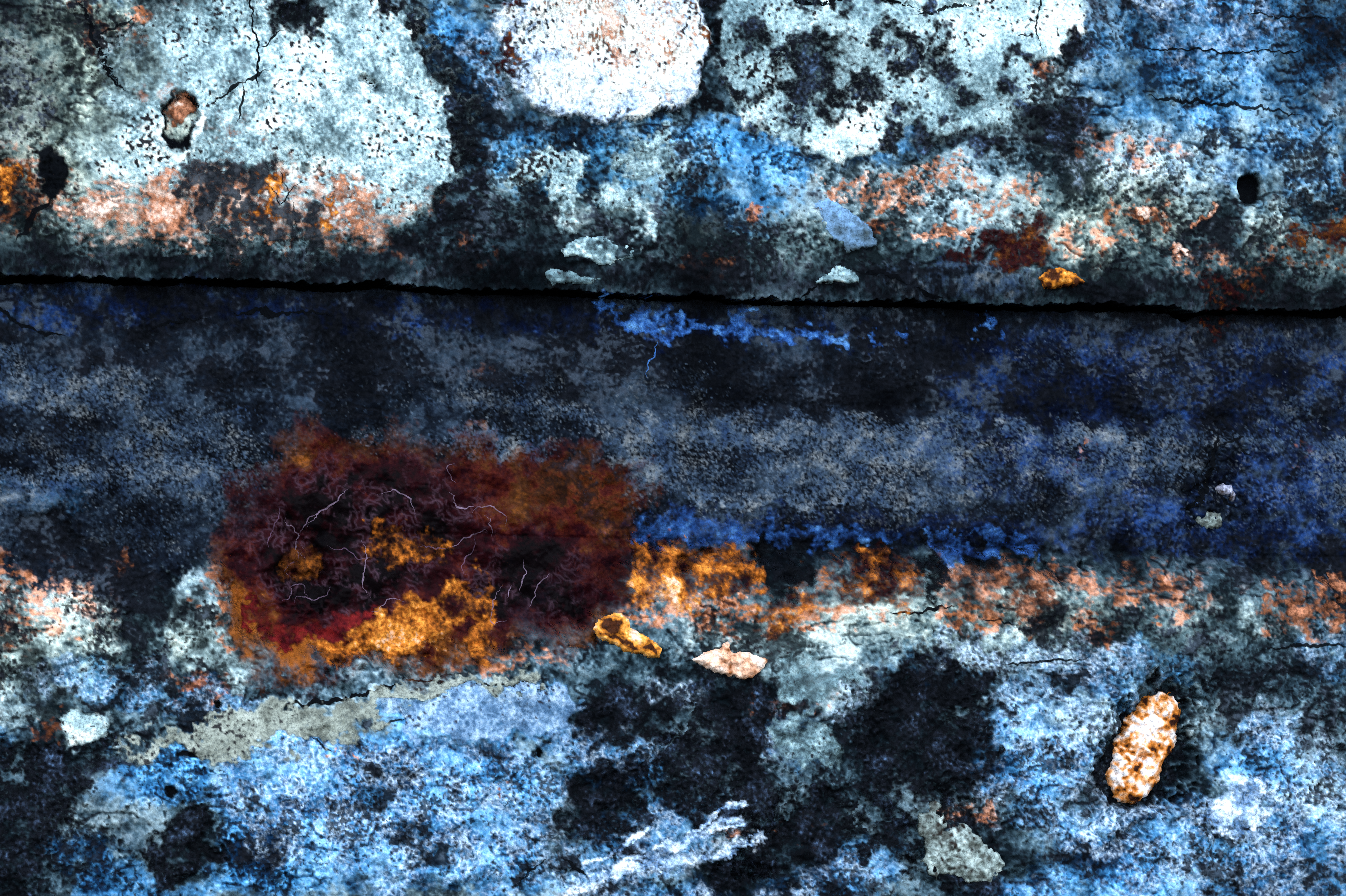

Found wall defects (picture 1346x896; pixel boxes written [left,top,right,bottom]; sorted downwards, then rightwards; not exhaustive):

crack [79,3,136,91]
crack [184,0,284,123]
mould [264,0,329,45]
damp [378,0,489,224]
damp [684,0,1113,159]
crack [894,1,972,15]
crack [1020,0,1044,52]
corrosion [54,163,417,254]
corrosion [820,149,1057,273]
corrosion [213,423,925,685]
corrosion [1256,570,1346,635]
flaking render [60,662,583,766]